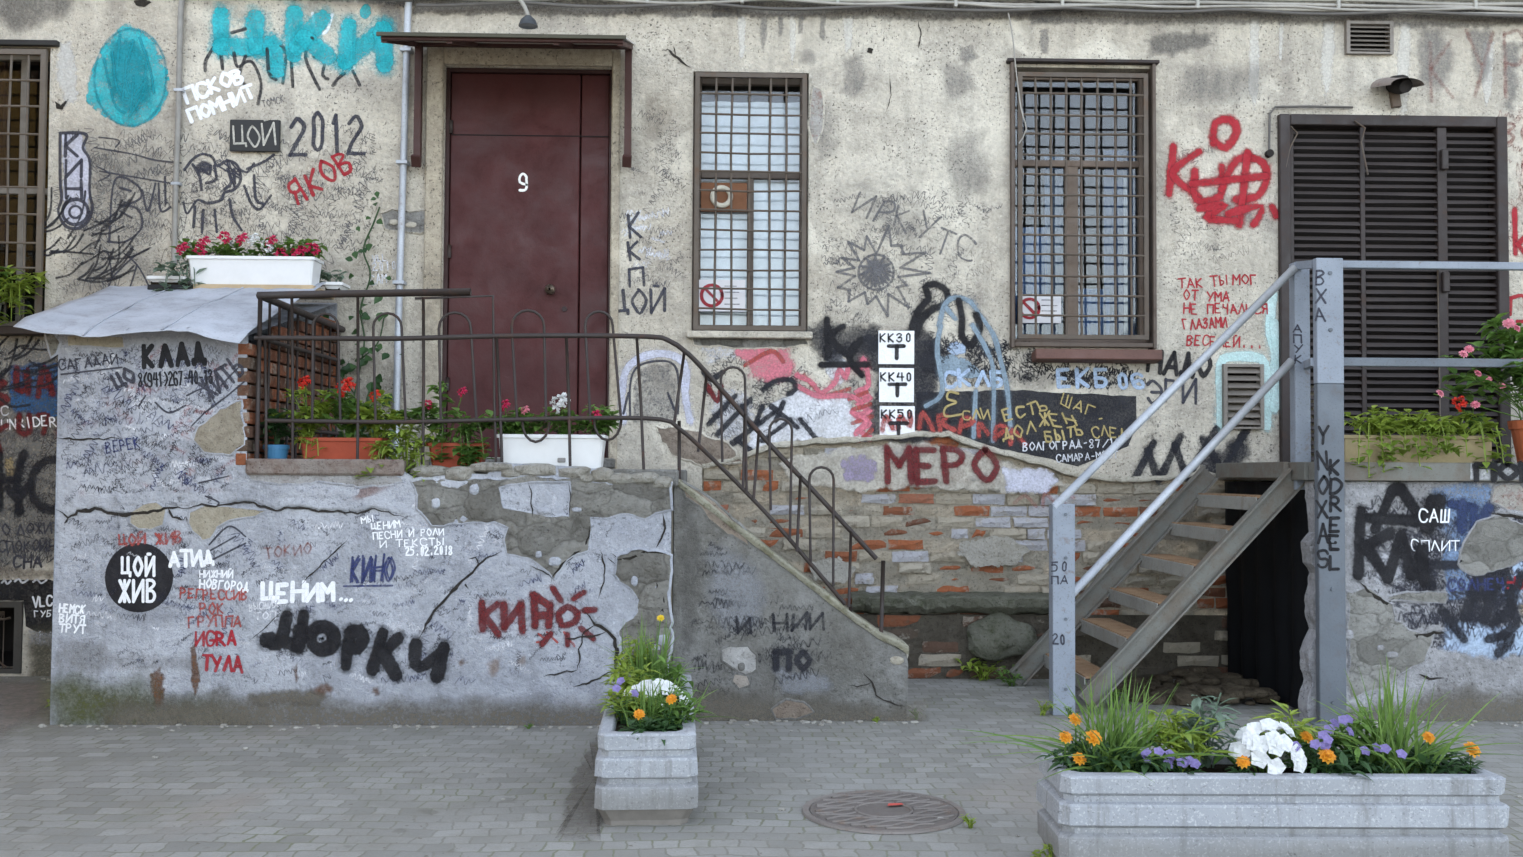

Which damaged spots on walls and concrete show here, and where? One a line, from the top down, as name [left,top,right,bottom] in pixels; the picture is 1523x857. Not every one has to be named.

flaking render [192,399,247,457]
flaking render [1228,388,1257,427]
flaking render [128,501,168,532]
flaking render [187,503,266,542]
crack [58,489,415,586]
flaking render [246,425,1275,615]
flaking render [1457,482,1523,577]
crack [419,484,667,687]